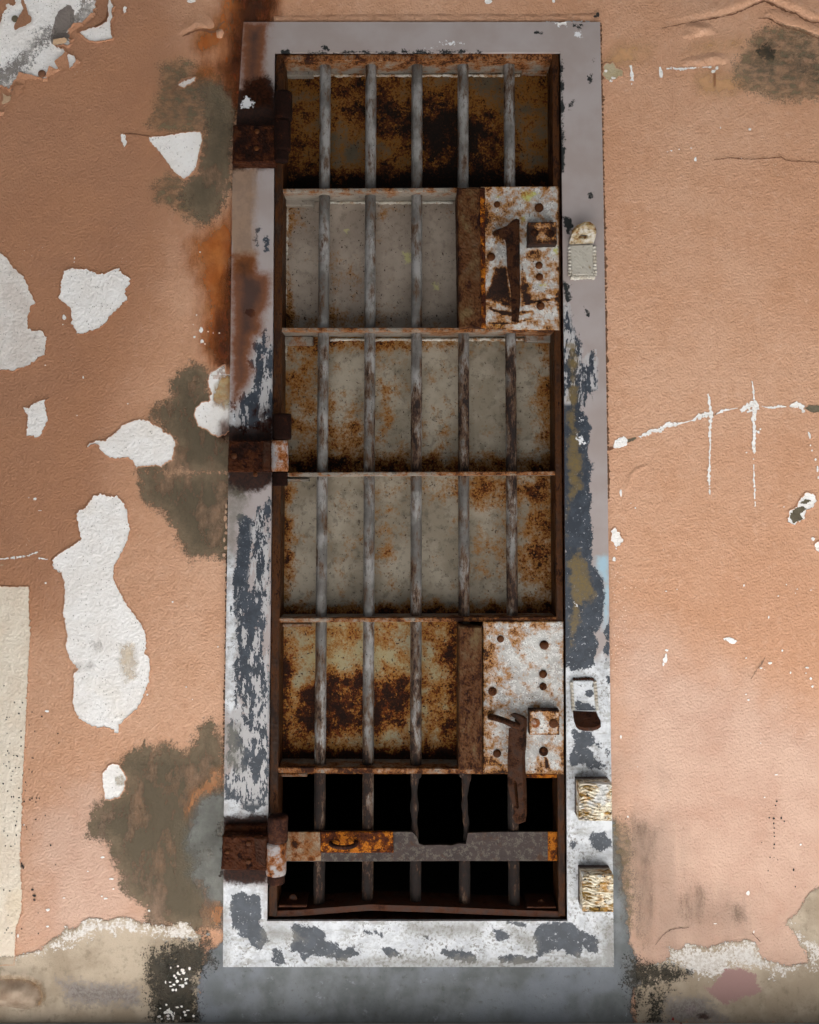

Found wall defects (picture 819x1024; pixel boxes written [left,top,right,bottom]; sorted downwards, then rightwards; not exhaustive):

peeling [0,0,128,116]
corrosion [196,0,275,109]
peeling [148,130,203,180]
leakage [143,60,237,228]
peeling [0,252,48,372]
peeling [57,257,131,335]
corrosion [193,220,232,365]
crack [546,21,819,506]
peeling [86,418,176,469]
leakage [133,360,229,562]
peeling [51,493,151,734]
leakage [84,716,225,934]